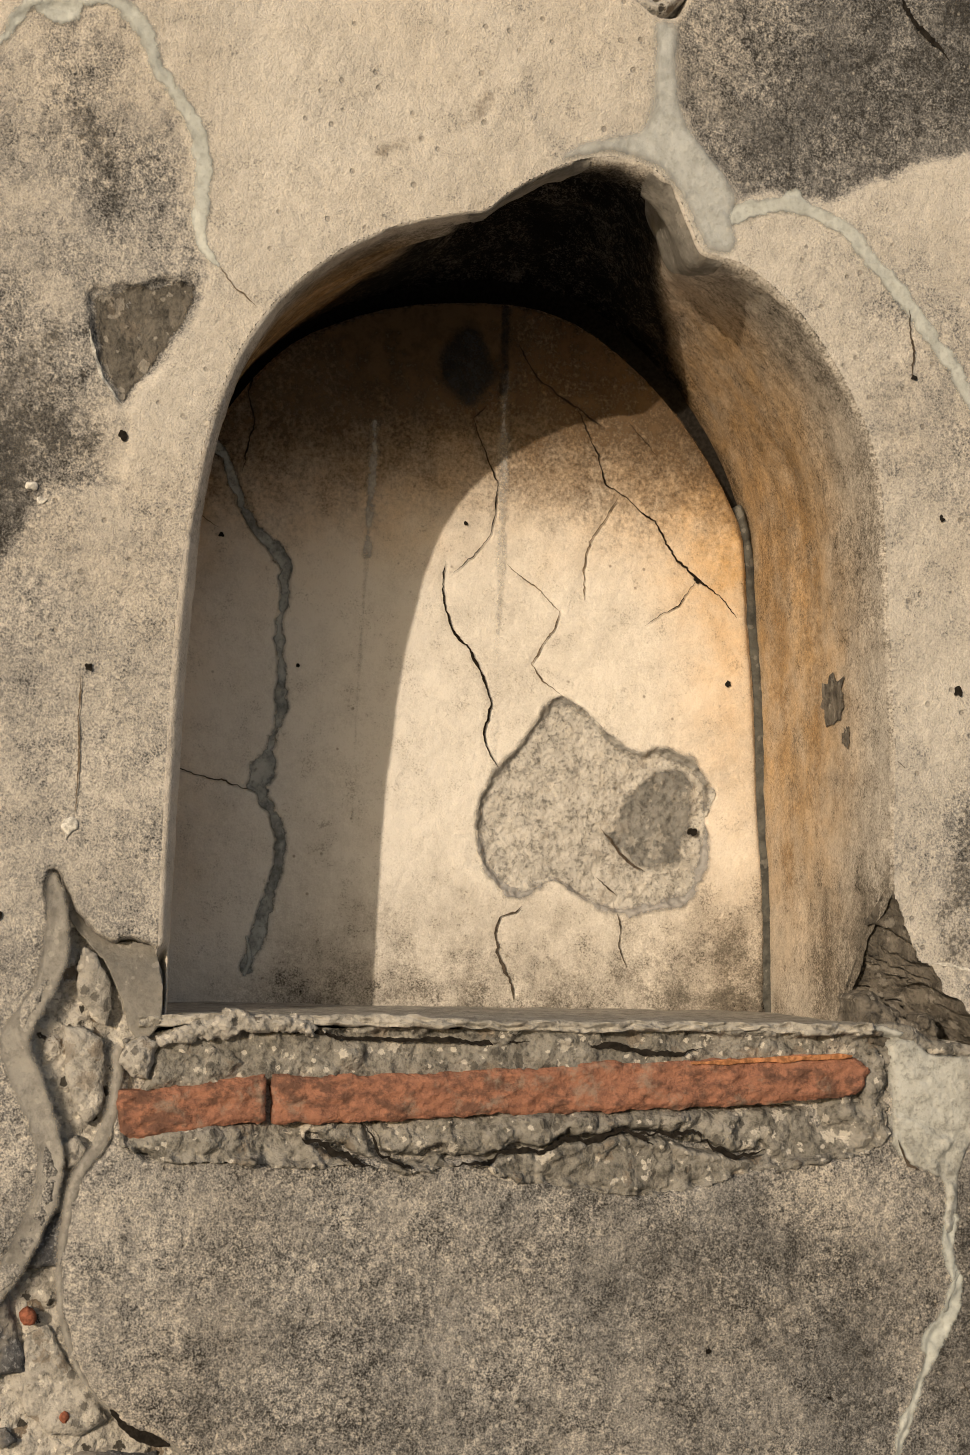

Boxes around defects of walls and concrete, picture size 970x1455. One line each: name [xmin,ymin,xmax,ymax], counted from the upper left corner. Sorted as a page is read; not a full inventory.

crack [442,345,737,767]
crack [180,374,292,976]
spalling [475,695,716,918]
spalling [68,909,163,1038]
crack [494,907,521,1001]
crack [617,914,626,965]
spalling [837,889,970,1057]
peeling [690,1053,852,1065]